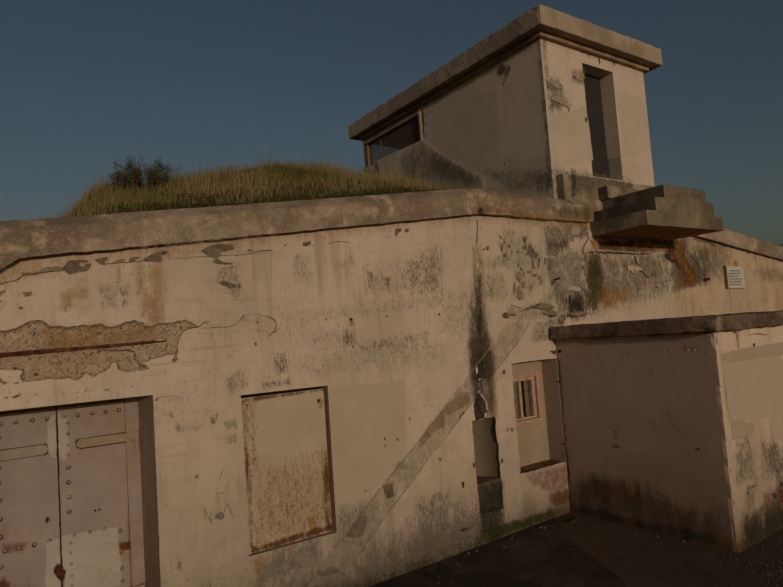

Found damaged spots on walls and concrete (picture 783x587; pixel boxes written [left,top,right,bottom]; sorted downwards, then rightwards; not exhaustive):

peeling [21,250,168,276]
peeling [201,244,234,269]
peeling [494,235,546,300]
leakage [534,207,670,339]
spalling [0,320,198,385]
leakage [469,249,496,416]
corrosion [252,458,333,575]
corrosion [54,564,66,583]